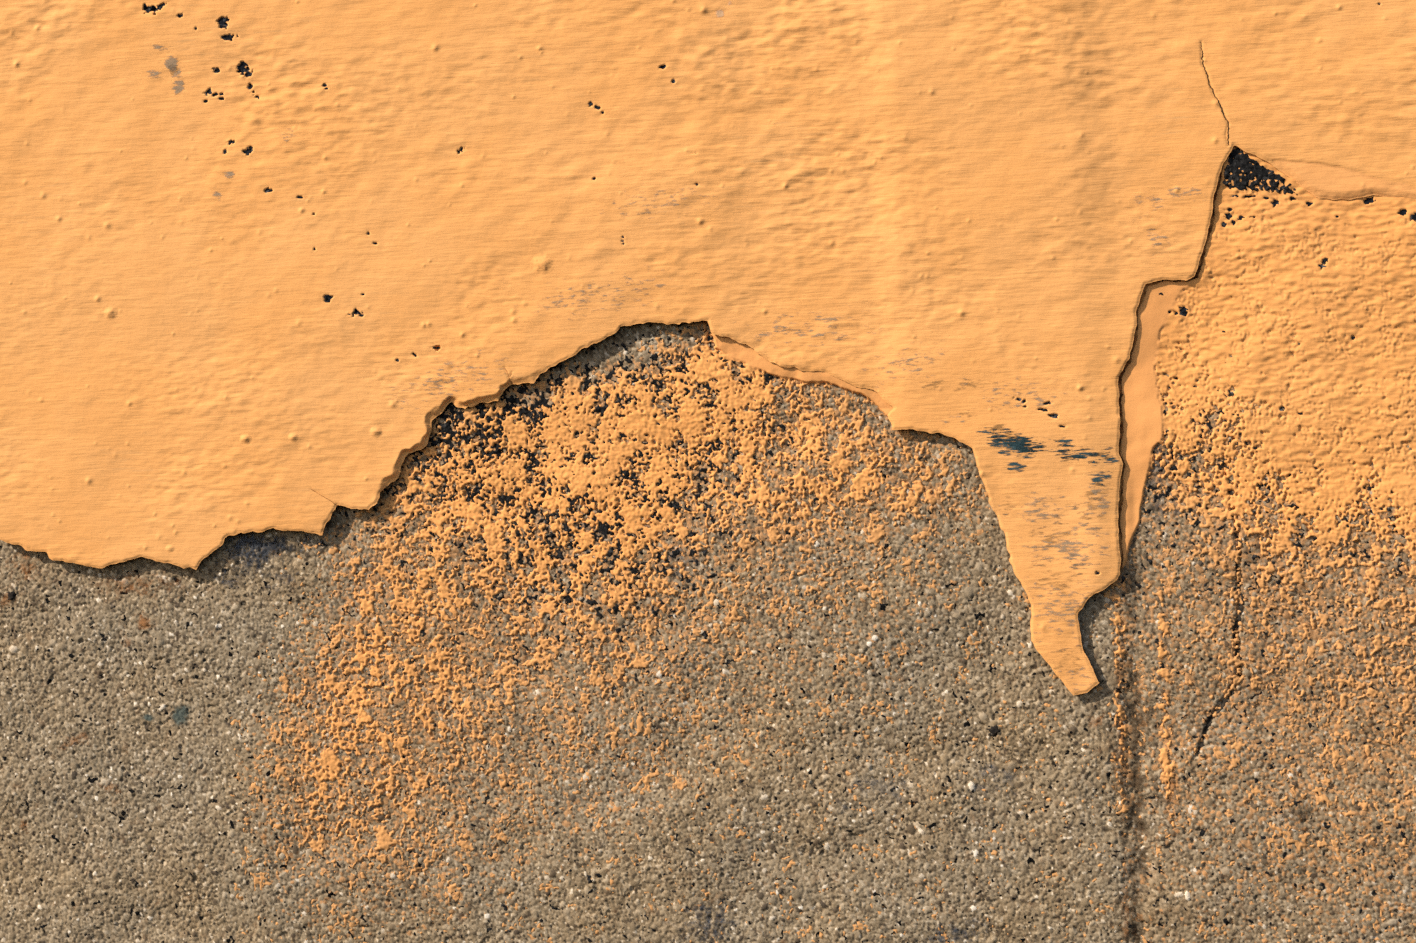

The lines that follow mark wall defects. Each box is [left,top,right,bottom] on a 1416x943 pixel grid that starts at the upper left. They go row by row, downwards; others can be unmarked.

peeling [1,721,193,943]
peeling [0,536,242,760]
peeling [190,146,1416,943]
crack [1118,45,1229,573]